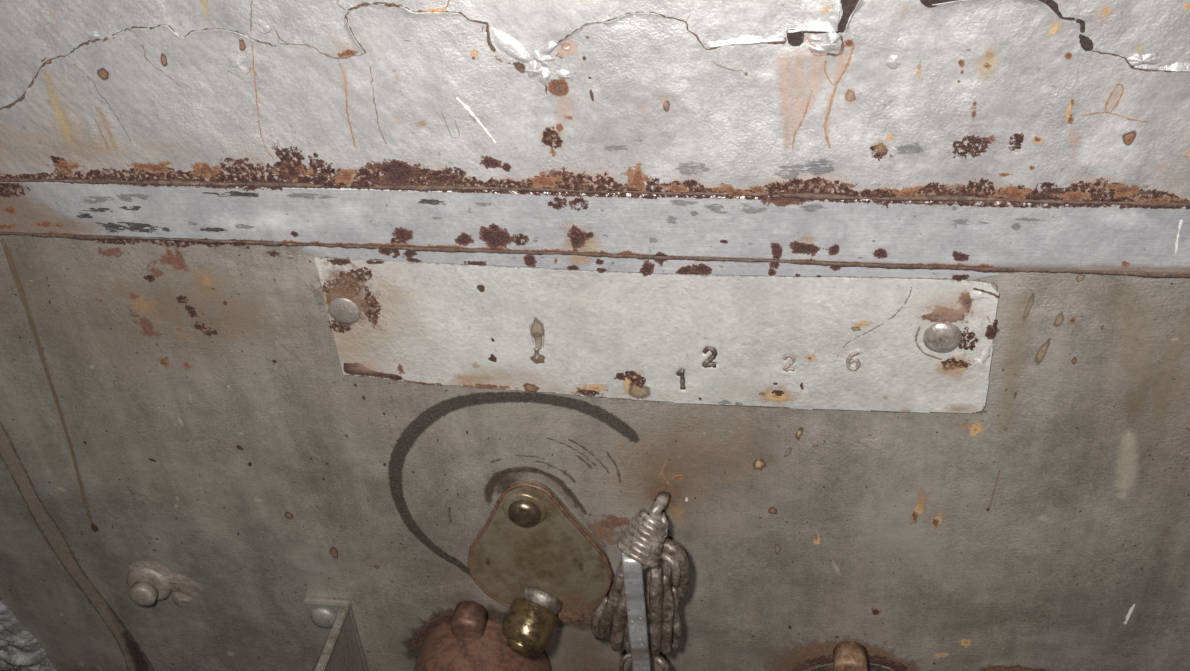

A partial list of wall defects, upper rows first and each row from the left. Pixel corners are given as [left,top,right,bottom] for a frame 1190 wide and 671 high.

crack [556,0,865,76]
crack [920,0,1190,72]
crack [0,0,489,159]
corrosion [952,101,995,158]
corrosion [1065,98,1074,124]
crack [1084,112,1148,123]
corrosion [0,115,1190,374]
corrosion [771,636,916,671]